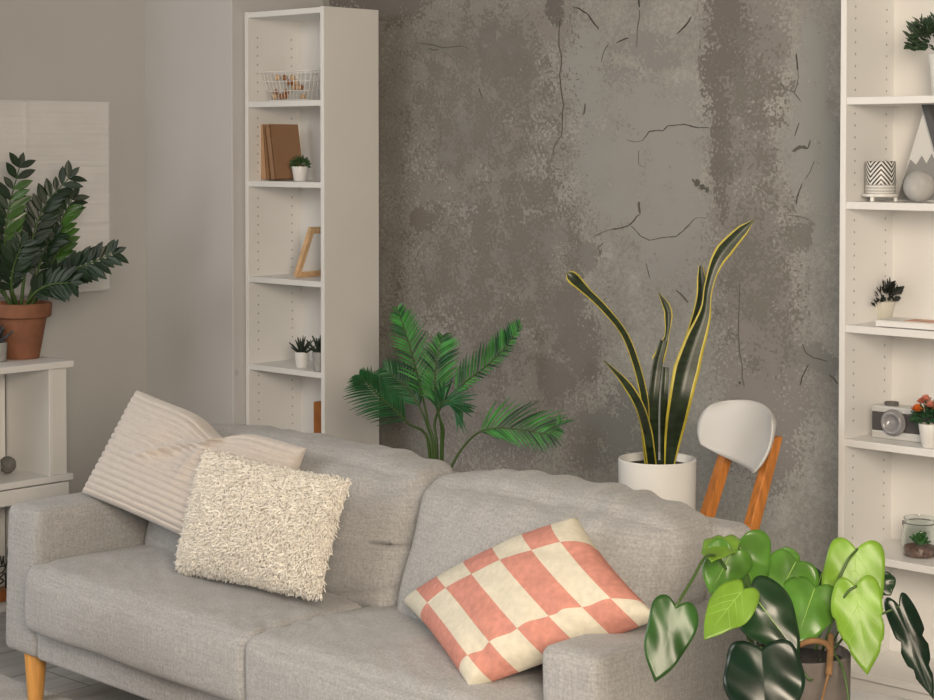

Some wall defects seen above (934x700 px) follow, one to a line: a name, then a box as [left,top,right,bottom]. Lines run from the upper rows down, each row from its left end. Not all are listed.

crack [553,0,640,155]
crack [780,54,800,100]
crack [628,124,728,167]
crack [787,162,814,220]
crack [593,213,706,255]